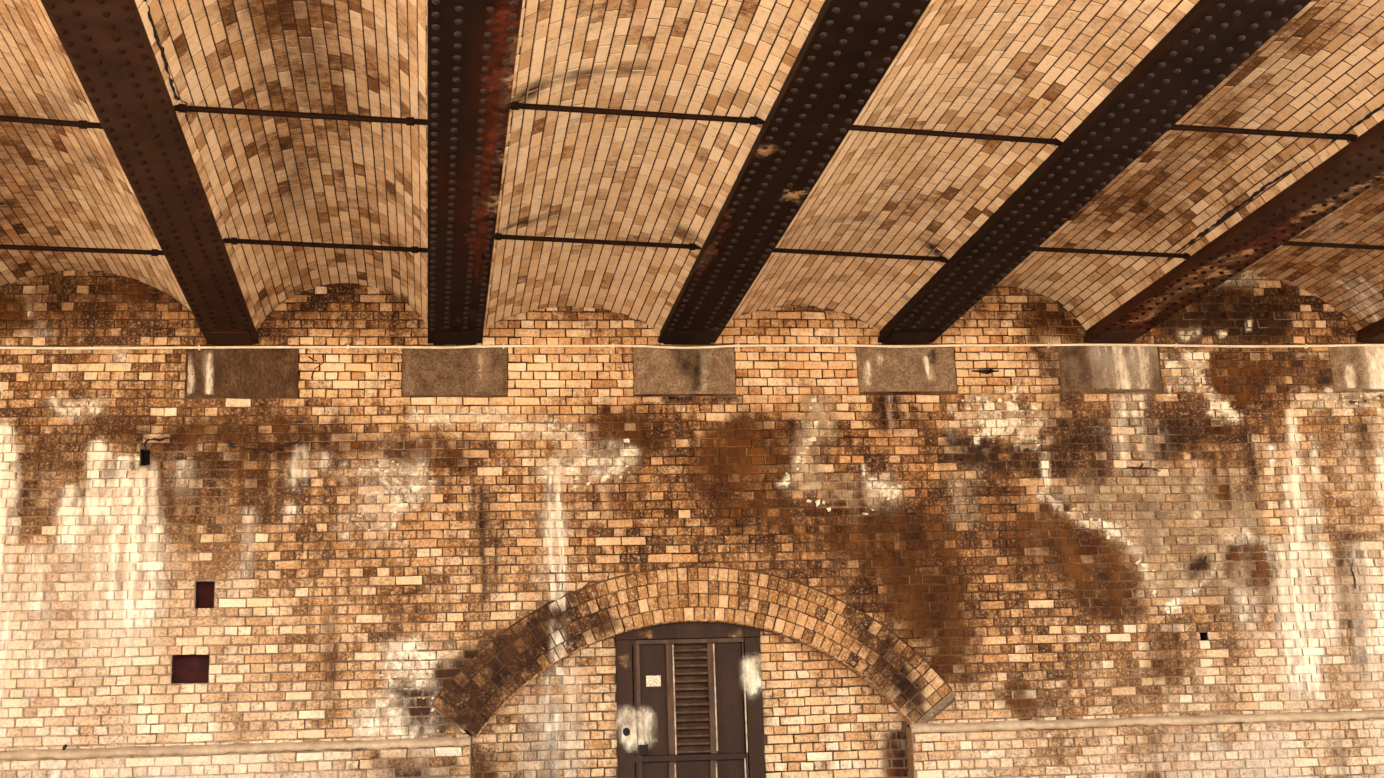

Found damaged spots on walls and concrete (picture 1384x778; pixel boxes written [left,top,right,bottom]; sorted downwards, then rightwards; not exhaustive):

water stain [588,406,669,501]
water stain [663,350,816,533]
water stain [815,465,970,680]
water stain [874,395,918,431]
water stain [1004,684,1044,720]
water stain [978,298,1146,620]
water stain [1154,633,1183,676]
water stain [1160,346,1384,698]